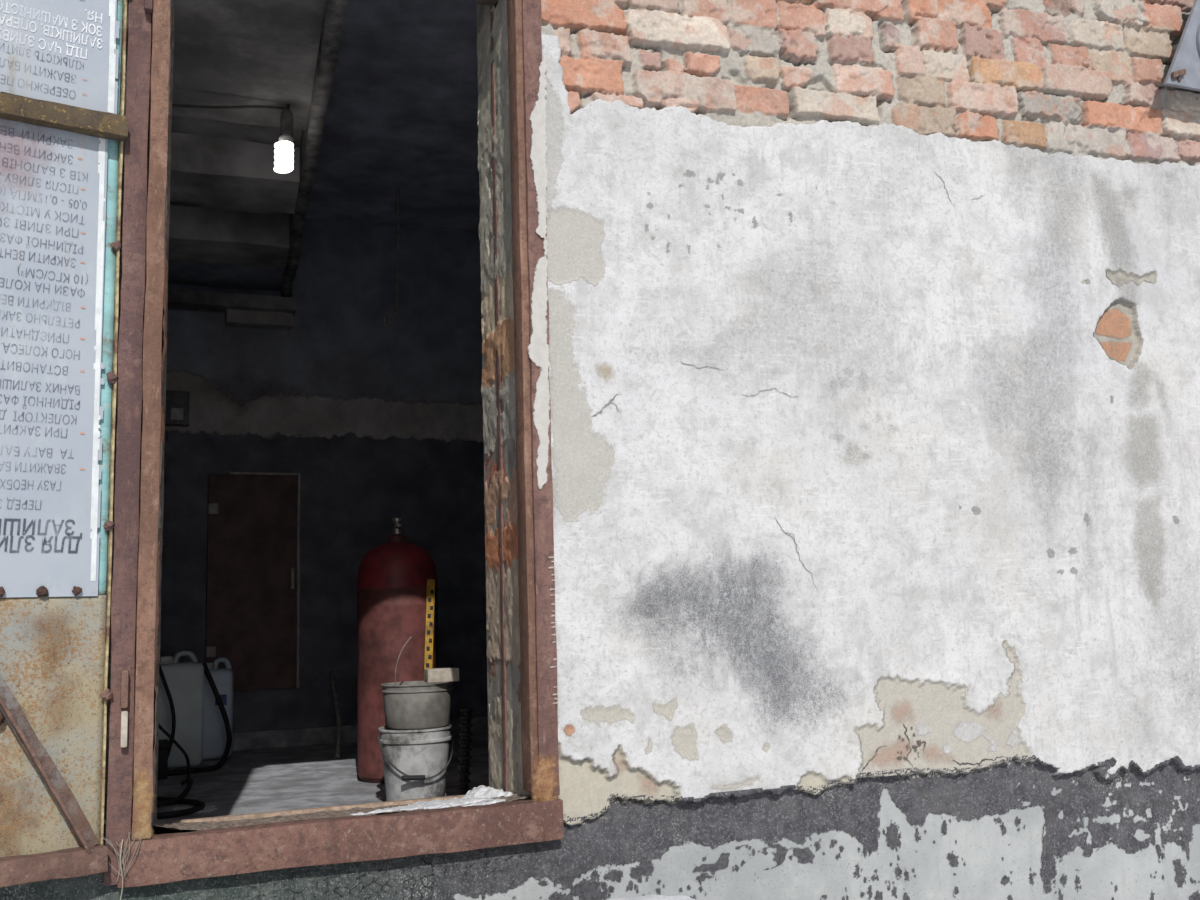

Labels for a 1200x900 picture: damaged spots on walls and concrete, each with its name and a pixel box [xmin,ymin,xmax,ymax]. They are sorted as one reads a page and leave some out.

peeling [545,77,615,522]
spalling [1093,269,1157,369]
crack [775,518,818,591]
corrosion [134,772,152,837]
flaking render [554,704,681,826]
peeling [653,698,698,760]
flaking render [795,641,1036,795]
peeling [538,856,665,900]
peeling [679,820,966,900]
peeling [994,817,1025,900]
peeling [1053,863,1081,900]
peeling [1150,857,1200,887]